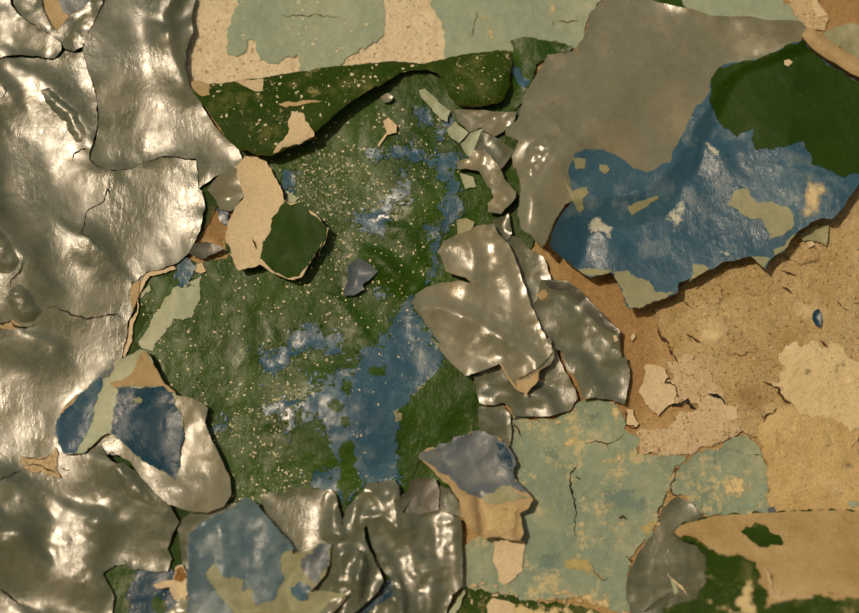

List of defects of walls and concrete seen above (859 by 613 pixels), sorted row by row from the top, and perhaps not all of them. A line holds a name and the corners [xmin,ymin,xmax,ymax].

peeling [377,118,397,147]
crack [81,171,112,247]
peeling [189,156,329,280]
peeling [412,89,635,405]
crack [0,321,34,329]
crack [49,306,125,321]
peeling [55,349,231,513]
crack [590,412,636,447]
spalling [632,353,743,457]
peeling [400,405,533,541]
crack [569,464,580,535]
crack [0,589,27,608]